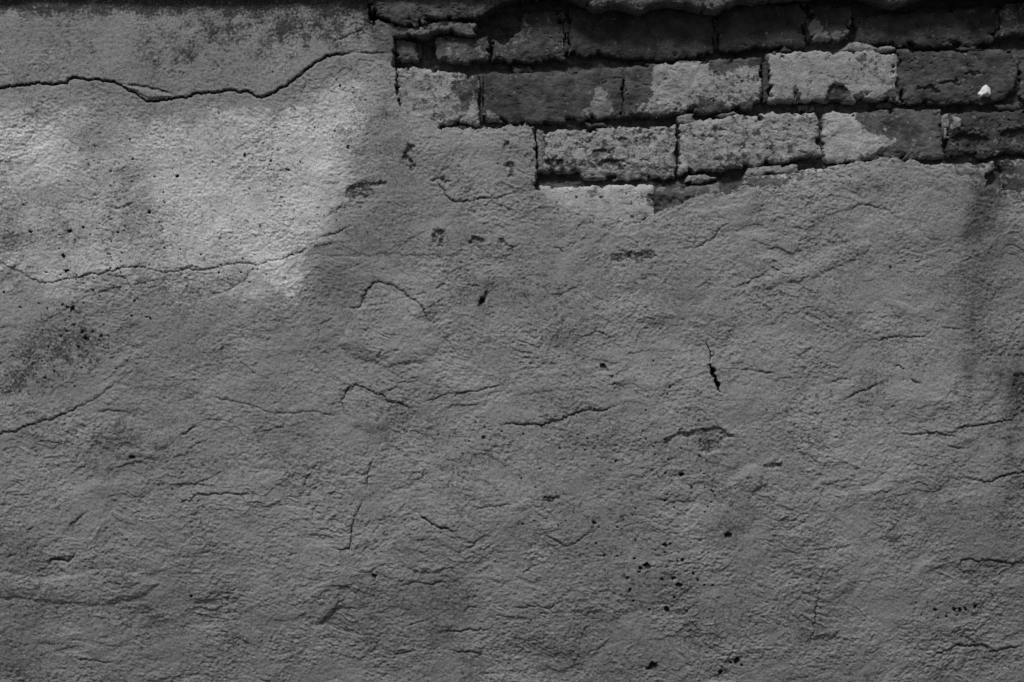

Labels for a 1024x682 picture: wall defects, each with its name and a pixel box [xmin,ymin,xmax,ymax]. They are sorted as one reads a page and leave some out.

crack [0,37,372,103]
spalling [394,0,1024,221]
crack [31,247,306,286]